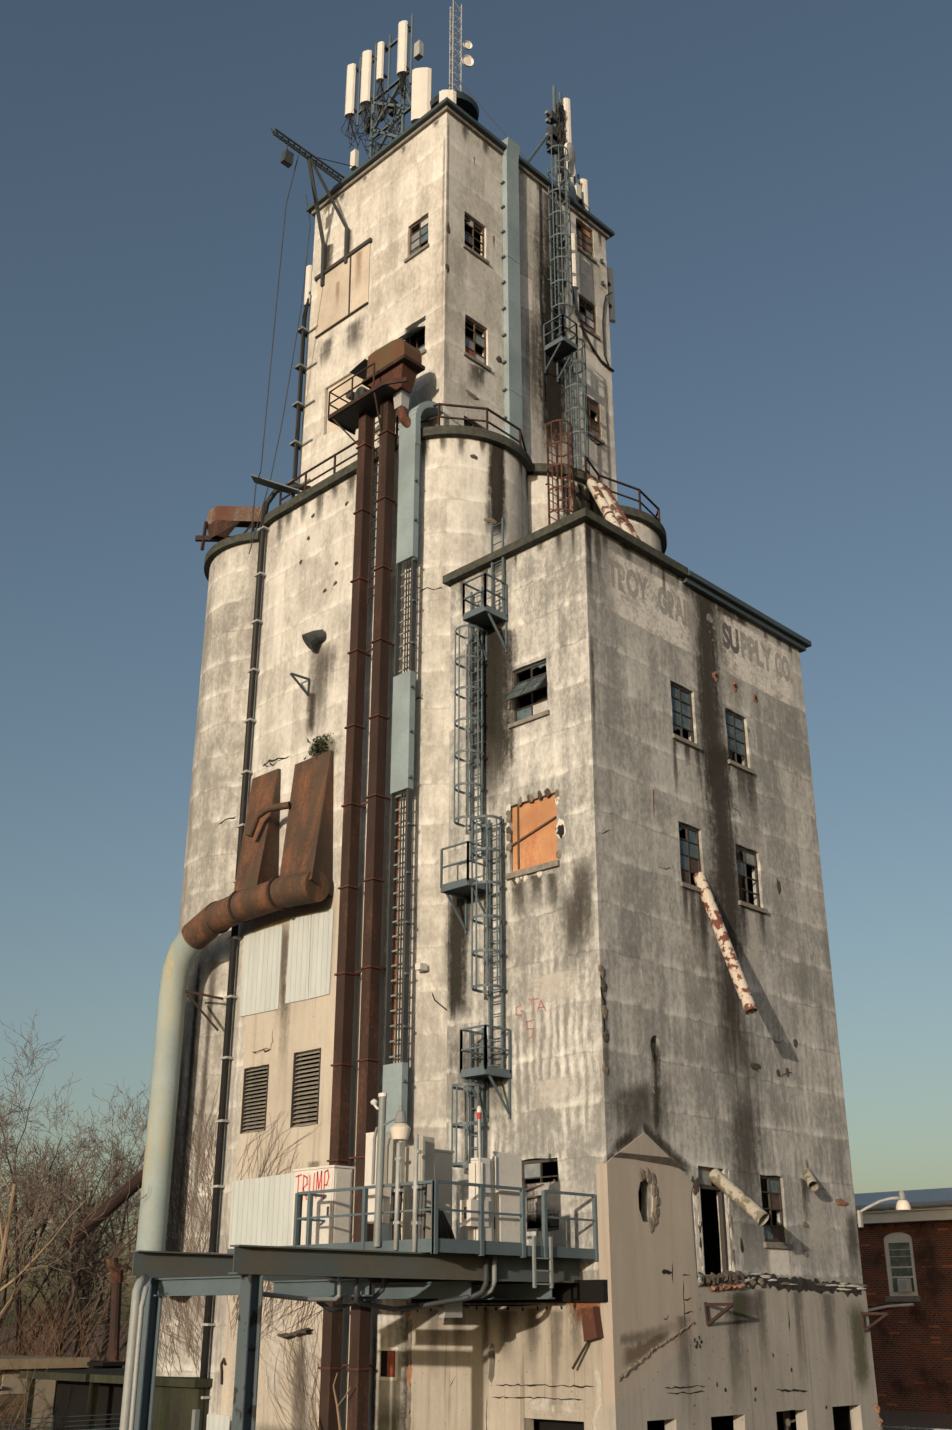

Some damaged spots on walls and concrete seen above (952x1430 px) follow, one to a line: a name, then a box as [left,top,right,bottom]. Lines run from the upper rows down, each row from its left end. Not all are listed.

water stain [529,185,568,442]
water stain [422,438,528,534]
water stain [650,560,764,1068]
water stain [733,1110,760,1194]
spalling [639,1167,660,1234]
peeling [825,1282,867,1291]
water stain [852,1315,866,1378]